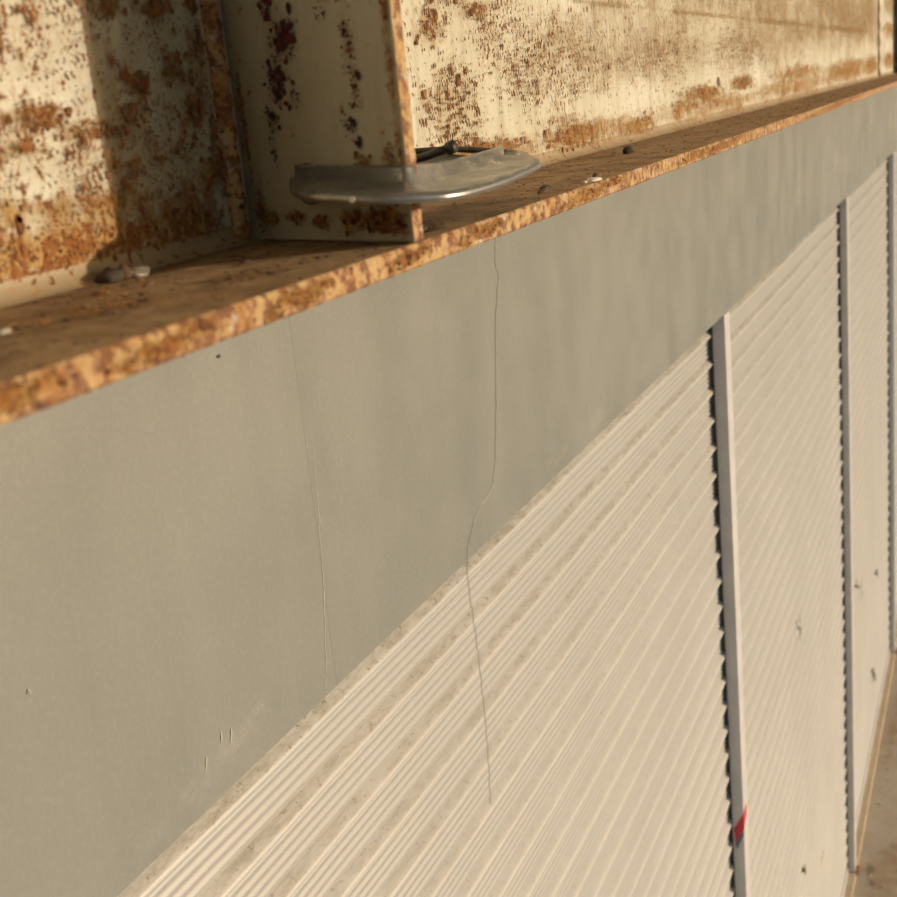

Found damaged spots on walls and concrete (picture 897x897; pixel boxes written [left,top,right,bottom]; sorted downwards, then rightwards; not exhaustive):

corrosion [0,0,230,284]
corrosion [236,73,409,237]
corrosion [337,16,364,107]
corrosion [409,0,896,155]
corrosion [678,133,745,165]
corrosion [391,244,432,273]